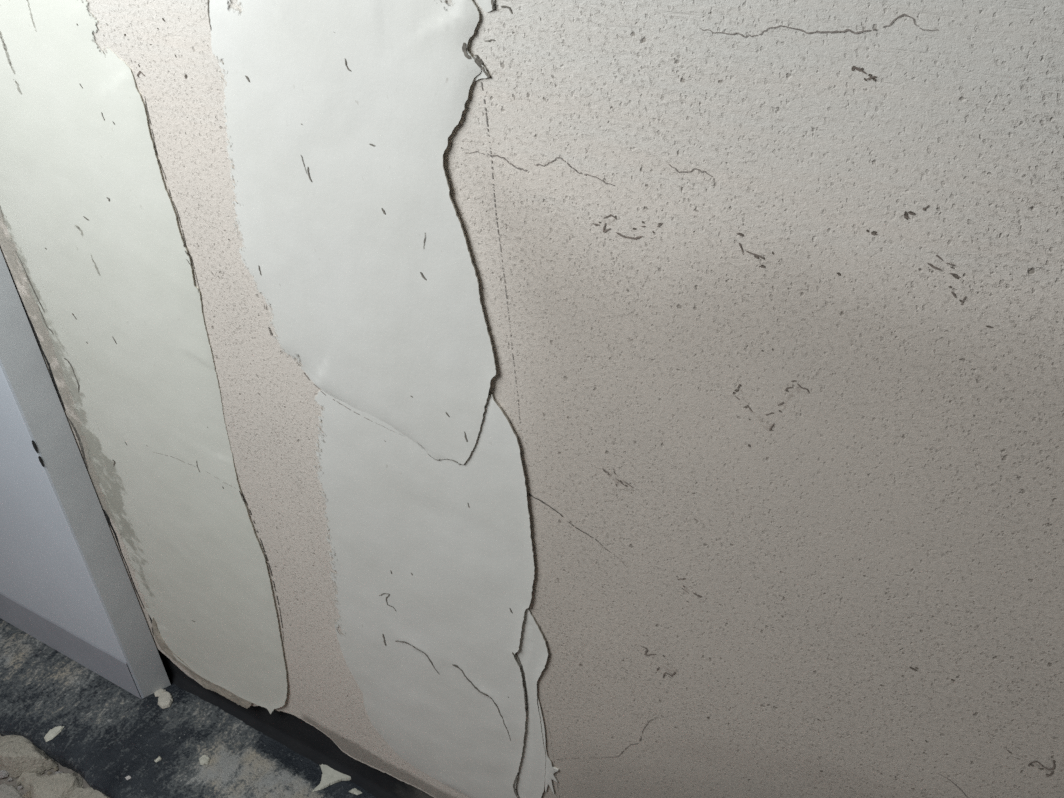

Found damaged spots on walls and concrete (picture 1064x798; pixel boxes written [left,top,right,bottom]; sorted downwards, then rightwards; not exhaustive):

peeling [0,0,288,714]
peeling [209,0,559,798]
crack [699,13,938,37]